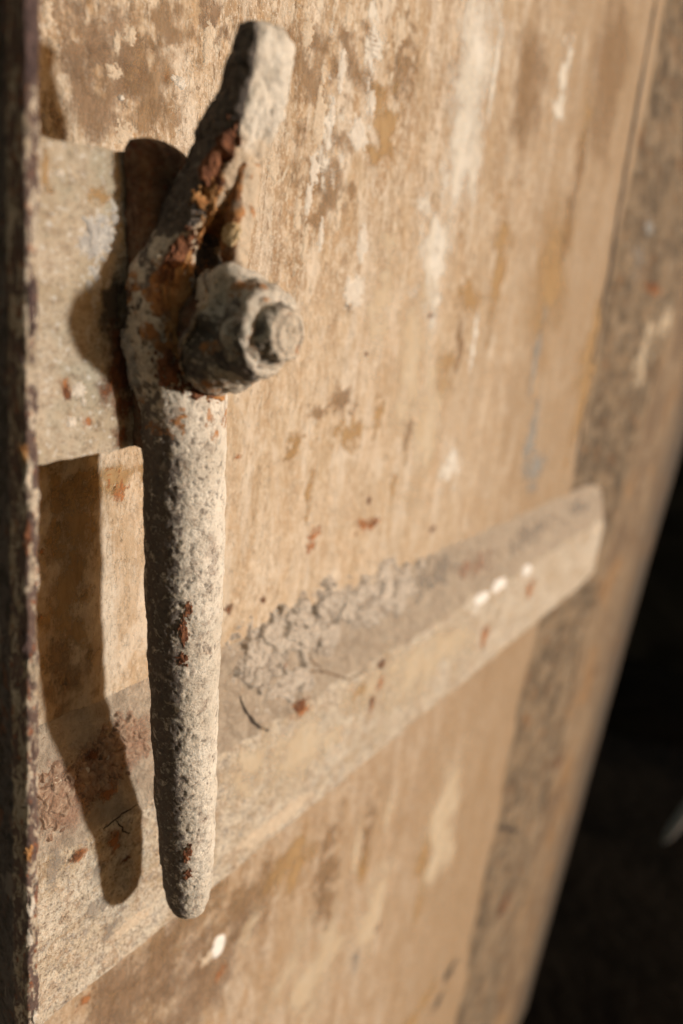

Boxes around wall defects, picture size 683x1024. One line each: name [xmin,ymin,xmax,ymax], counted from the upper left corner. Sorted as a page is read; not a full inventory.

rust [174,599,193,667]
spalling [223,549,497,715]
rust [69,848,88,863]
rust [183,843,194,881]